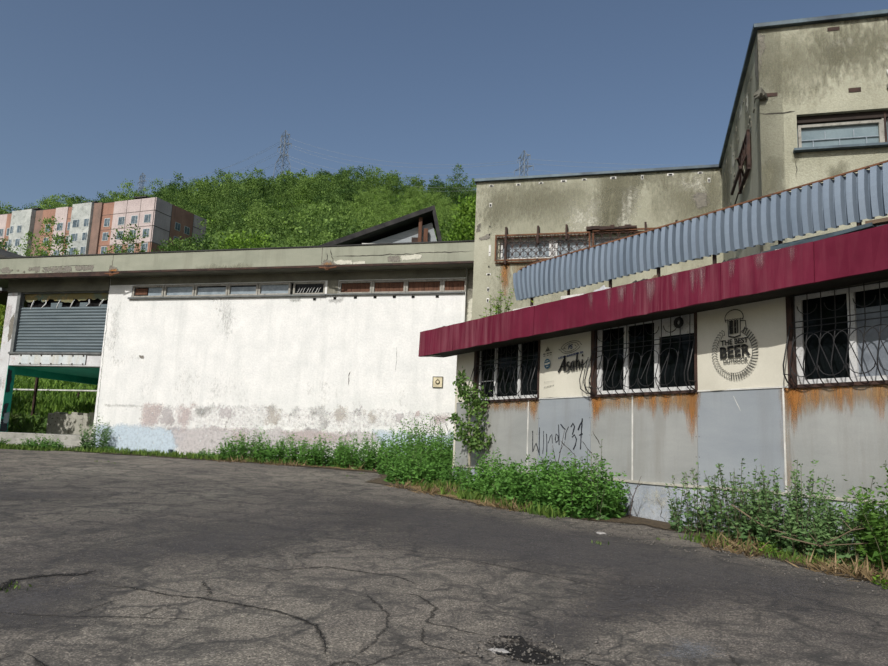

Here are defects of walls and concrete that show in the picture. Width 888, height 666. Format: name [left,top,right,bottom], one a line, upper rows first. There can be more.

damp [663,82,750,216]
damp [599,173,647,227]
peeling [95,404,453,456]
rust [592,393,697,423]
rust [785,384,888,412]
spalling [493,635,560,660]